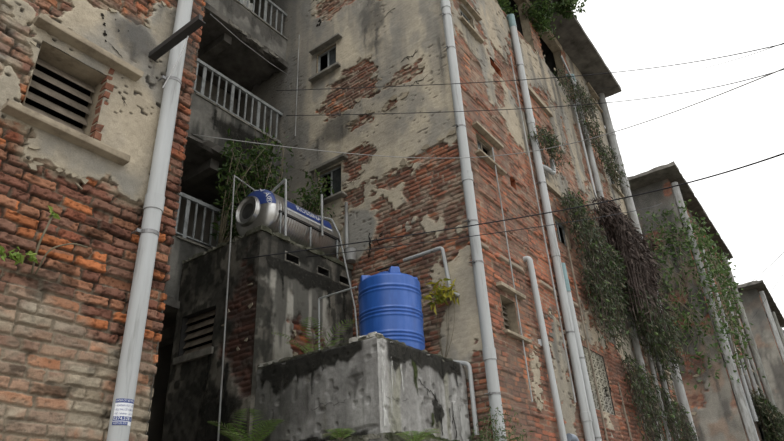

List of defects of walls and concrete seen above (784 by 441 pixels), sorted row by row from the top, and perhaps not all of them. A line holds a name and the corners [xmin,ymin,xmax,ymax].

peeling [0,0,75,105]
peeling [87,0,178,42]
peeling [311,0,355,21]
peeling [315,54,425,132]
peeling [142,0,205,357]
peeling [0,118,145,346]
peeling [338,130,473,354]
leakage [200,354,241,441]
leakage [261,340,362,395]
leakage [381,339,462,427]
crack [418,379,457,438]
peeling [466,338,494,441]